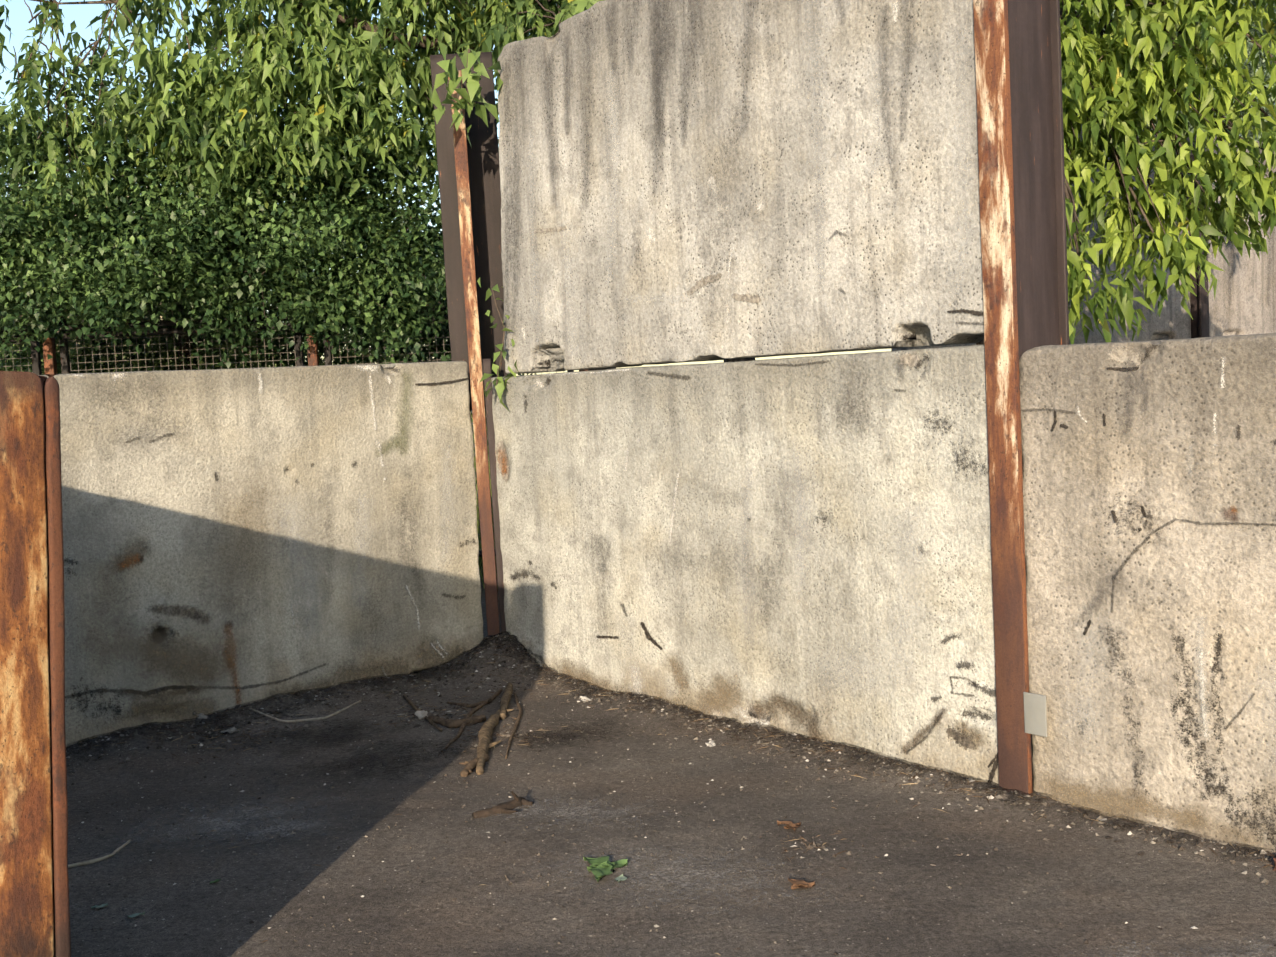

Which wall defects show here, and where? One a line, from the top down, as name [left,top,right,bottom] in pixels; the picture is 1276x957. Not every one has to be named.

damp [1099,625,1150,798]
damp [1171,624,1276,850]